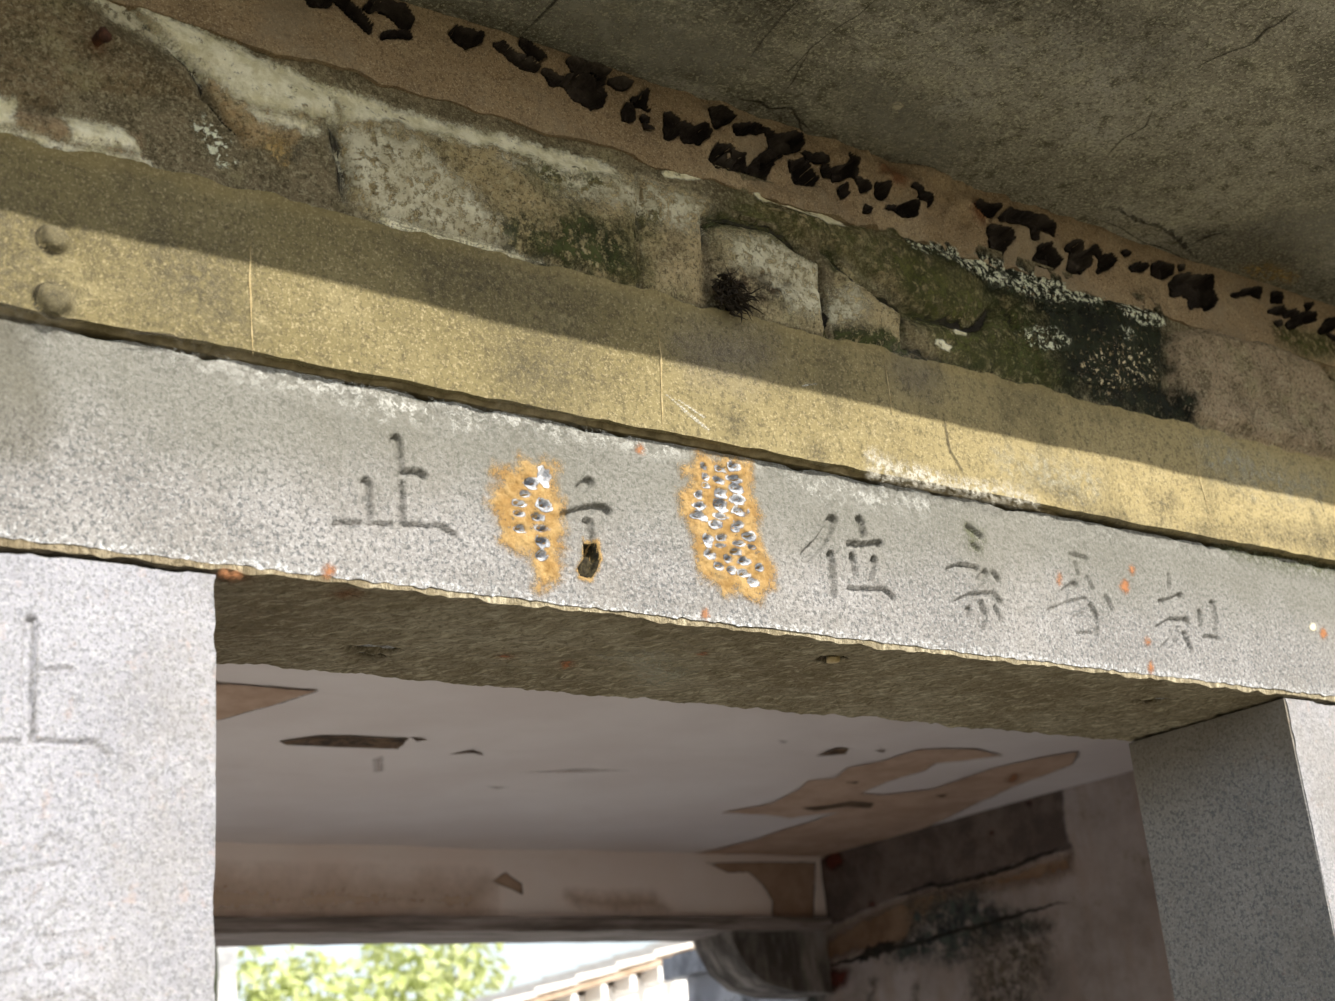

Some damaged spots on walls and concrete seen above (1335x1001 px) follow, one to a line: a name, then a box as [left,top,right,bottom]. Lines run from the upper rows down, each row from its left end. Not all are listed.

spalling [305,0,415,41]
crack [526,0,557,30]
damp [0,98,152,167]
damp [92,0,704,263]
spalling [448,24,934,218]
damp [718,192,941,326]
spalling [974,198,1335,342]
damp [934,329,967,352]
spalling [576,539,602,582]
peeling [279,736,426,749]
peeling [696,748,1079,960]
damp [895,891,1049,1001]